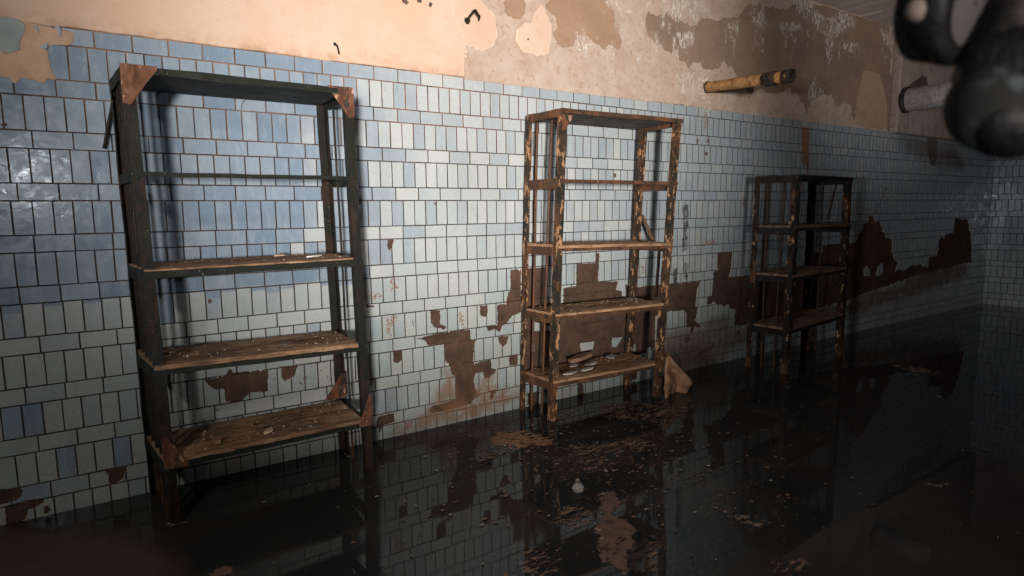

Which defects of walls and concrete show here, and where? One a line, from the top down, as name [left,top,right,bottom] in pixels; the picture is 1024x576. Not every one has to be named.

peeling [452,0,888,132]
peeling [412,215,973,413]
peeling [202,363,298,404]
peeling [376,411,395,433]
peeling [0,485,51,524]